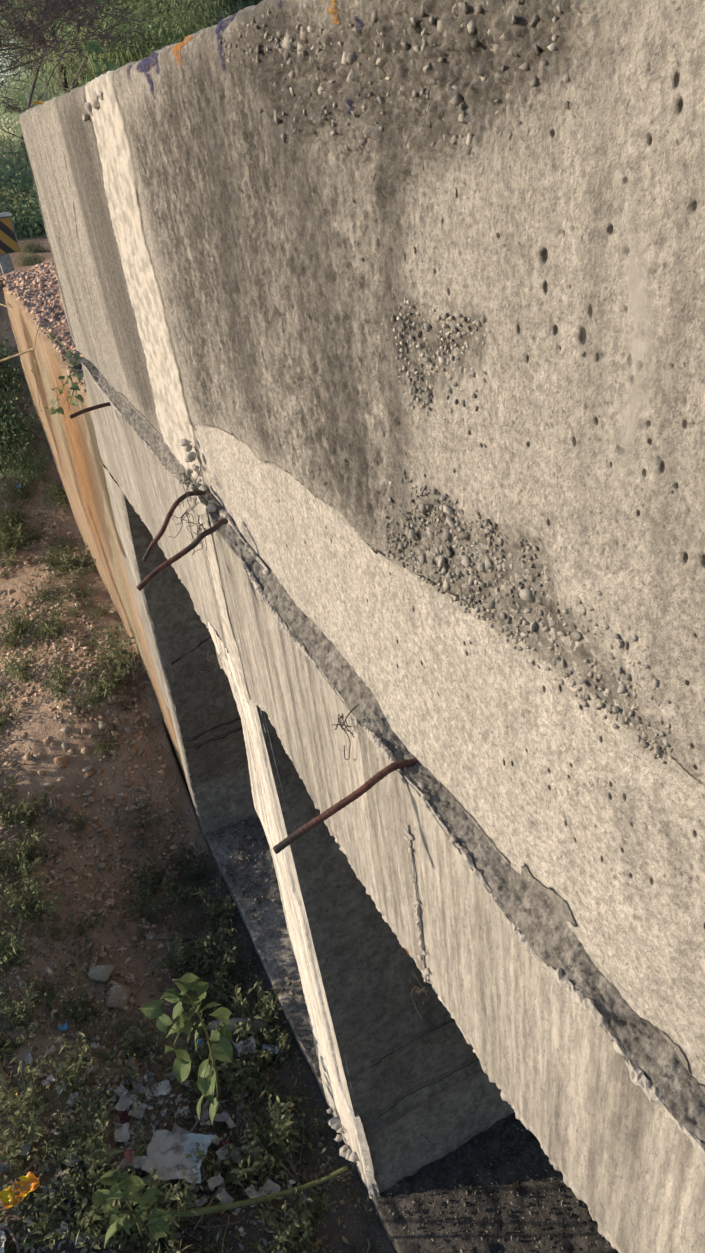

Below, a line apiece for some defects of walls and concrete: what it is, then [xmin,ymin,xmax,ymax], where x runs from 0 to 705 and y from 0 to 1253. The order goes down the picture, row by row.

crack [416,574,475,609]
crack [171,636,211,665]
crack [187,718,243,749]
spalling [648,1022,705,1094]